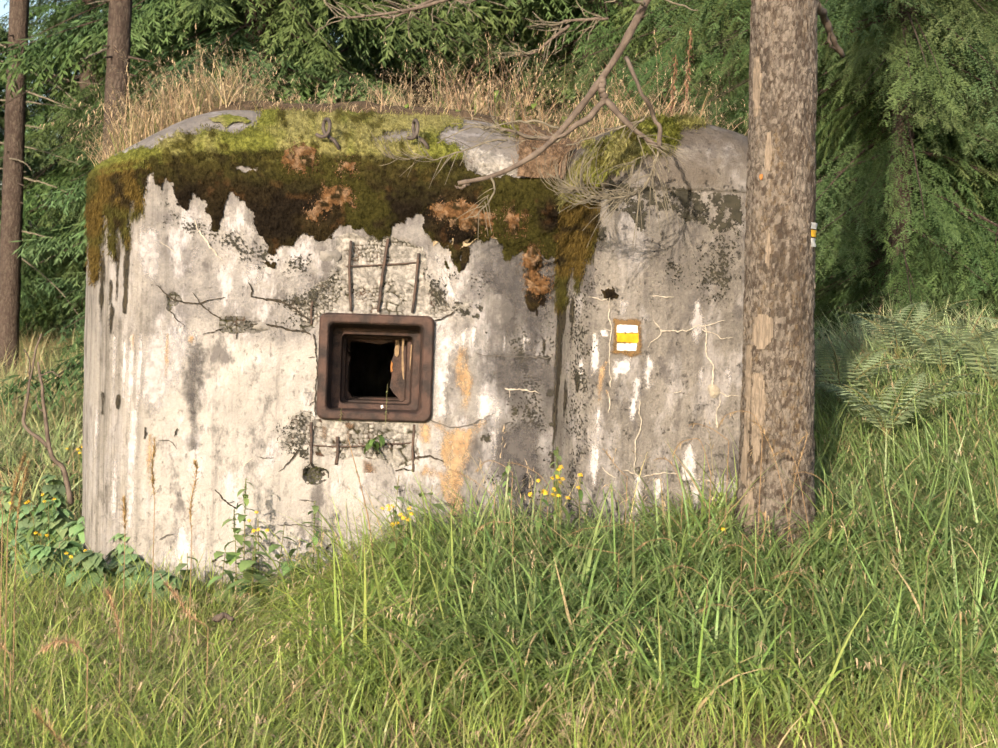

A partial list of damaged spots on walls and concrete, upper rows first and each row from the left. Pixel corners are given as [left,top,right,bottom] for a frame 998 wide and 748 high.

spalling [281,233,472,332]
damp [95,227,202,528]
crack [156,282,318,416]
rust [457,347,472,402]
damp [613,357,653,417]
spalling [275,410,419,485]
rust [421,421,485,516]